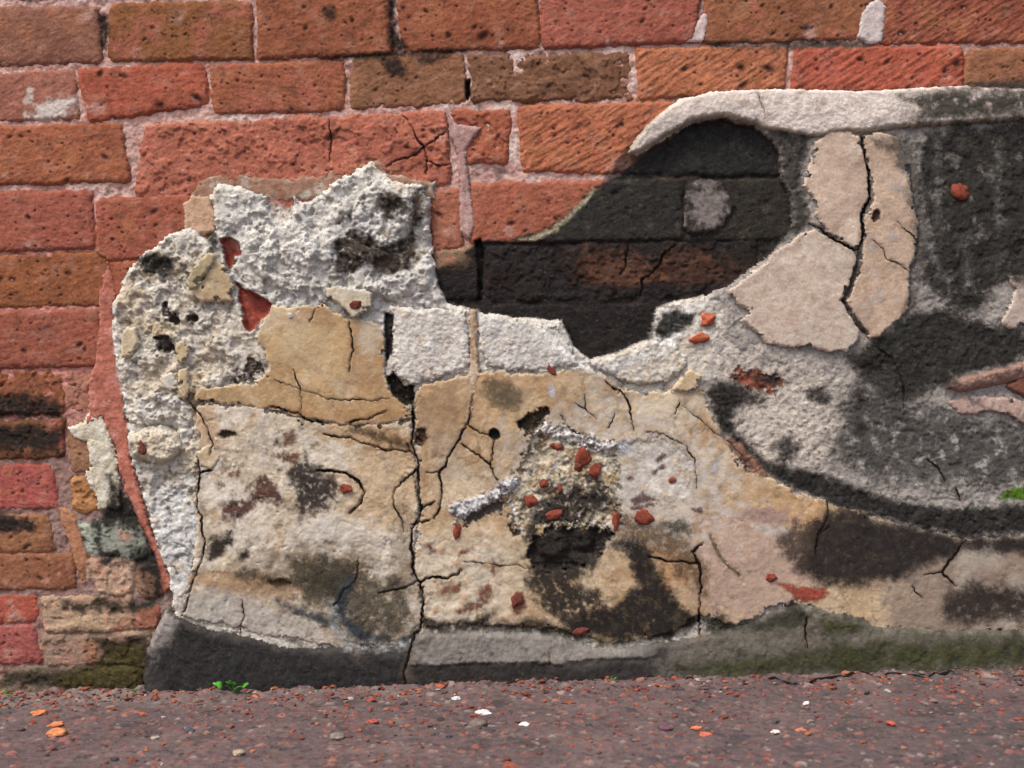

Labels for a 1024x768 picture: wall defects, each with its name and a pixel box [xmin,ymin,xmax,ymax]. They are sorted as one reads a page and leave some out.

crack [387,116,449,173]
water stain [710,38,865,50]
crack [181,402,214,616]
crack [347,322,355,370]
crack [270,369,525,684]
water stain [0,483,807,692]
flaking render [161,237,1024,648]
crack [560,381,745,487]
crack [652,536,739,637]
crack [810,138,910,403]
water stain [706,79,1024,588]
water stain [943,579,1024,625]